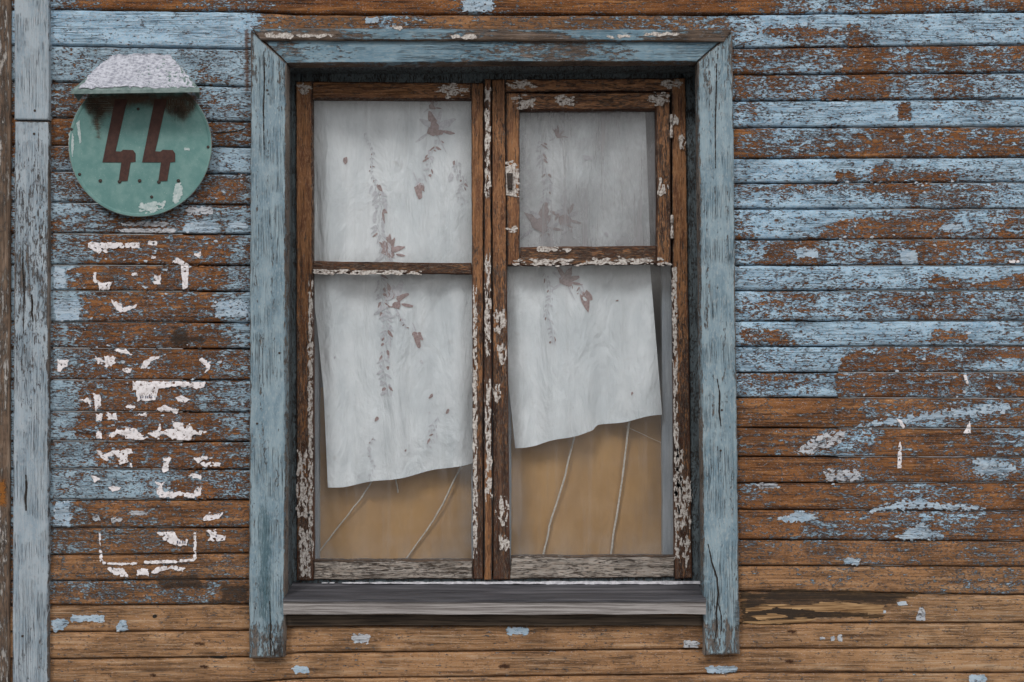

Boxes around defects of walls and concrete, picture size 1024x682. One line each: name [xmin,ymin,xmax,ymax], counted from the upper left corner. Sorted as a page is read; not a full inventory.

peeling [506,79,537,110]
peeling [647,79,683,106]
peeling [757,23,883,102]
peeling [835,101,955,194]
peeling [763,214,1024,291]
peeling [53,182,233,502]
peeling [741,327,784,345]
peeling [834,328,1024,398]
peeling [471,254,510,559]
peeling [513,246,693,568]
peeling [111,509,148,523]
crack [708,544,722,643]